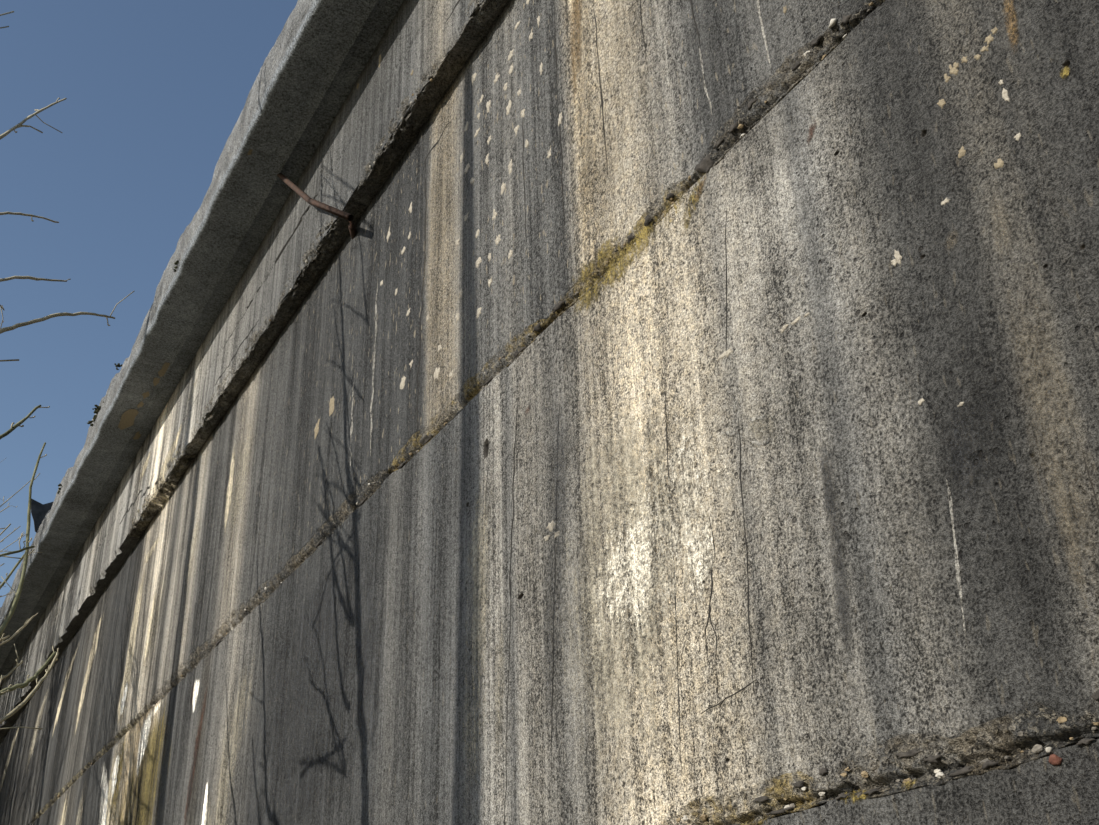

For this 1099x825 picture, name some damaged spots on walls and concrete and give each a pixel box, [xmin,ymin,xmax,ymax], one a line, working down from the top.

leakage [571,0,581,84]
leakage [224,435,250,529]
leakage [0,695,46,810]
leakage [53,652,76,732]
leakage [60,795,83,825]
leakage [76,614,104,728]
leakage [99,701,166,825]
leakage [118,538,165,721]
leakage [185,524,198,586]
leakage [190,680,200,712]
leakage [202,681,250,825]
crack [665,395,757,763]